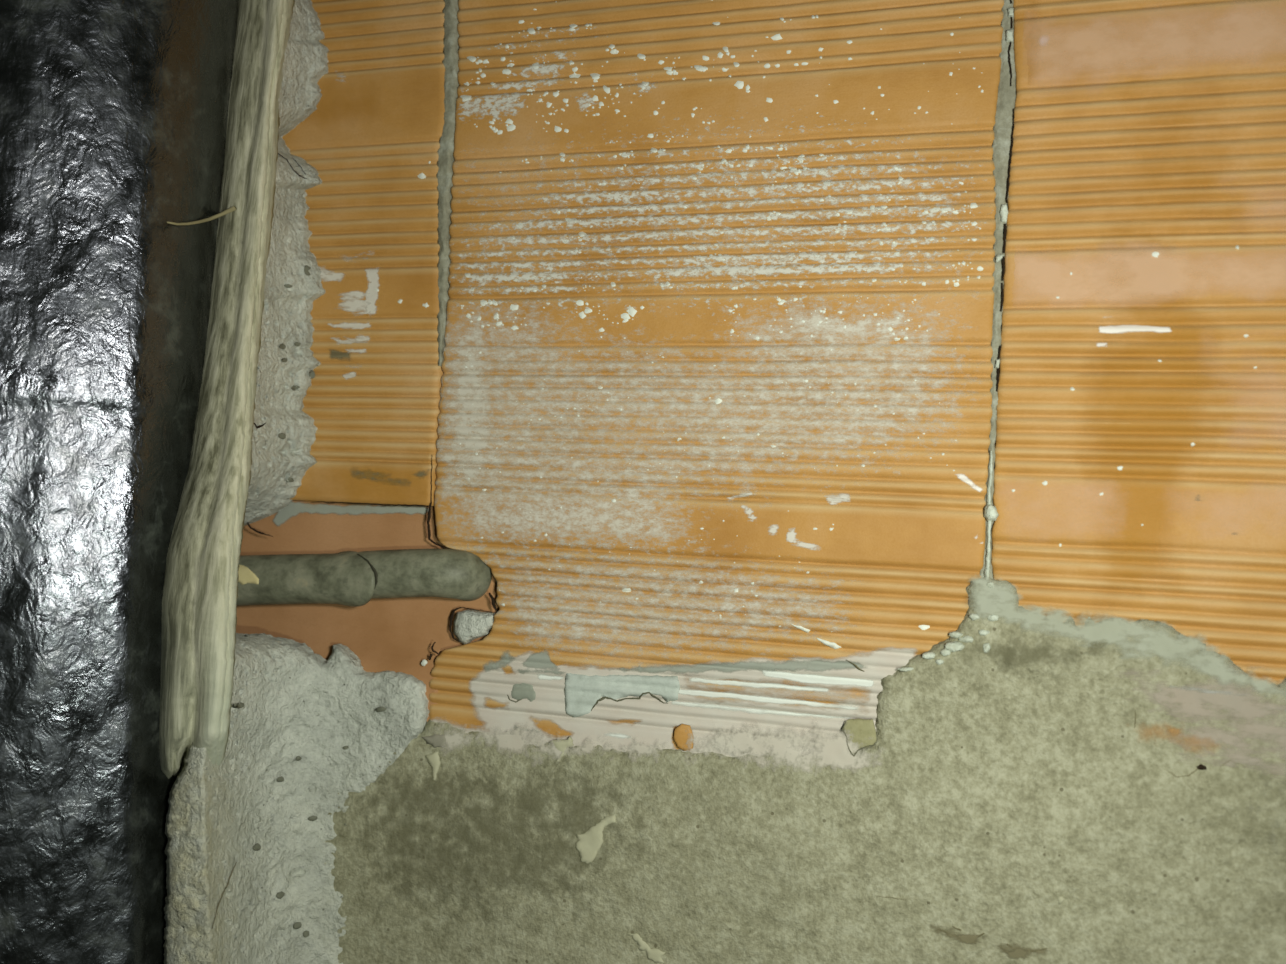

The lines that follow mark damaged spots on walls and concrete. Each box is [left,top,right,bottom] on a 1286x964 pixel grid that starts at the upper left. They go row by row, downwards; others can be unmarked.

leakage [458,28,577,120]
leakage [575,94,595,111]
crack [1000,0,1015,311]
leakage [436,116,986,654]
crack [994,346,1002,392]
spalling [238,500,451,585]
peeling [236,574,916,781]